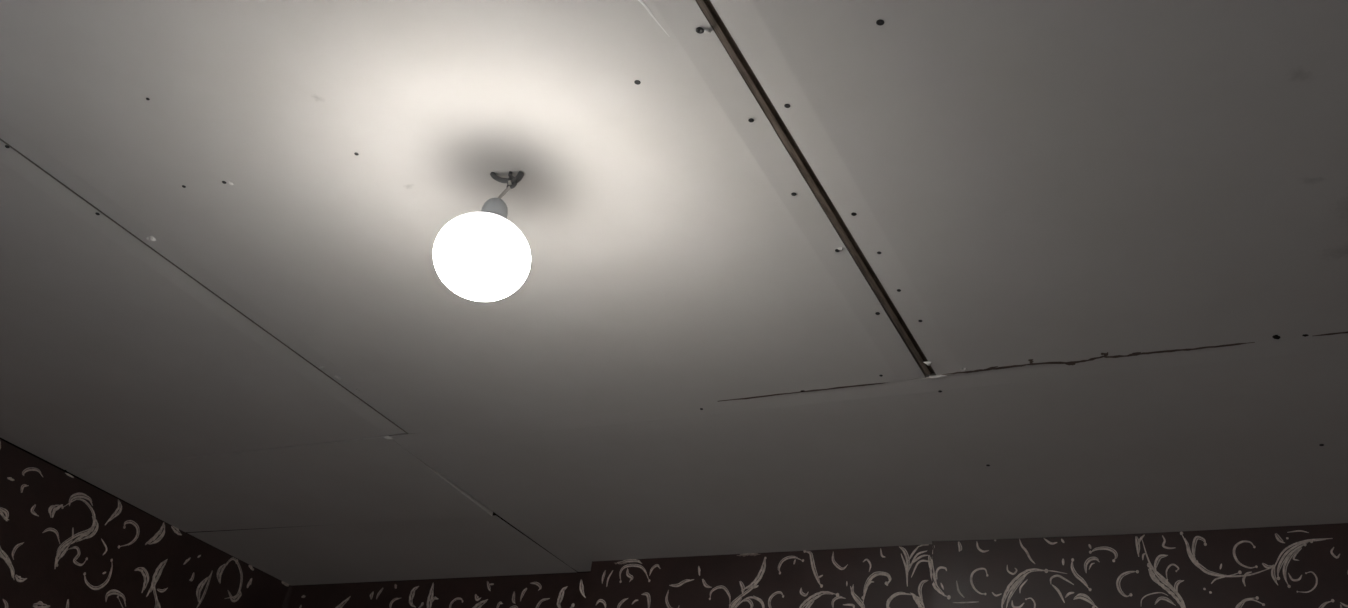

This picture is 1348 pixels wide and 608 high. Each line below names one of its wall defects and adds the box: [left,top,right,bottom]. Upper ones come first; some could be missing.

crack [1314,329,1348,337]
crack [942,342,1255,375]